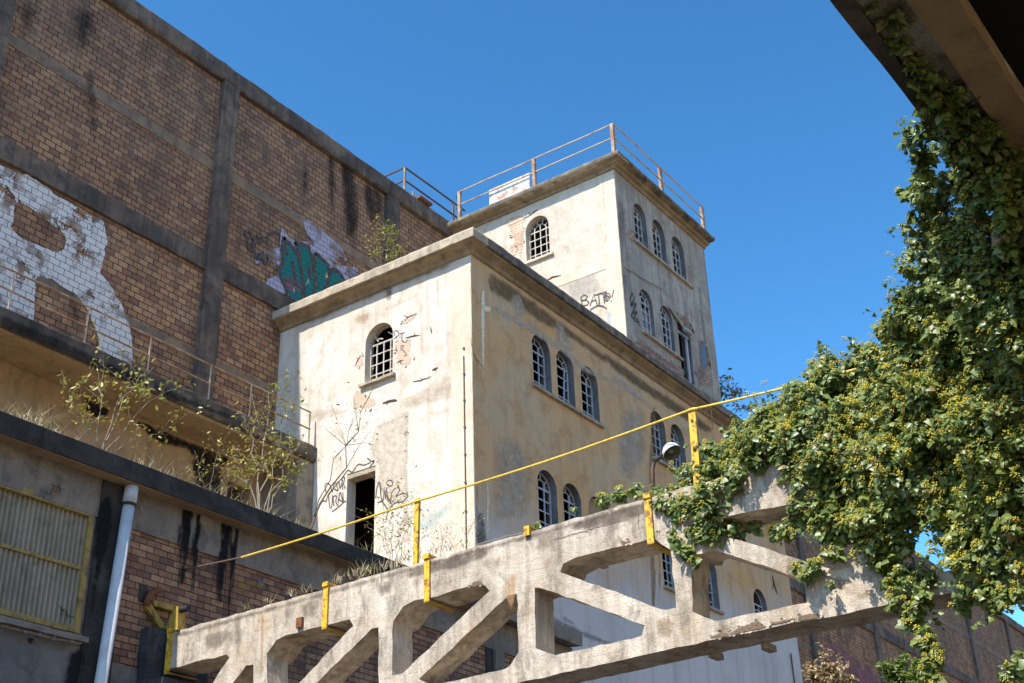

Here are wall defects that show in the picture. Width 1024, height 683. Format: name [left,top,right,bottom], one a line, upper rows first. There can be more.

flaking render [506,215,526,257]
flaking render [392,312,417,365]
flaking render [351,390,376,410]
leakage [92,496,112,608]
leakage [178,510,202,592]
leakage [216,524,245,607]
leakage [65,650,85,683]